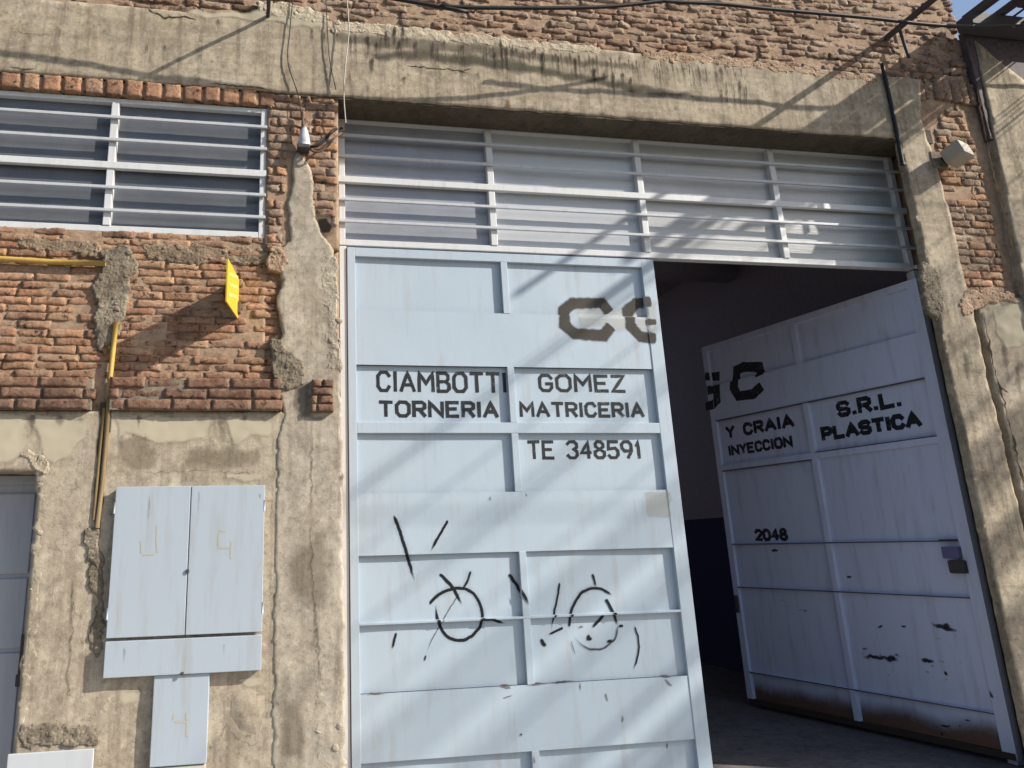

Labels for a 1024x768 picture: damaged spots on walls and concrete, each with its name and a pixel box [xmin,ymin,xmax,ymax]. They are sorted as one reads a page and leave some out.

water stain [311,22,417,70]
water stain [479,40,645,91]
spalling [15,95,338,350]
spalling [902,42,1024,349]
spalling [269,338,306,391]
spalling [321,254,343,373]
crack [984,318,1024,487]
spalling [17,519,100,751]
spalling [83,527,106,658]